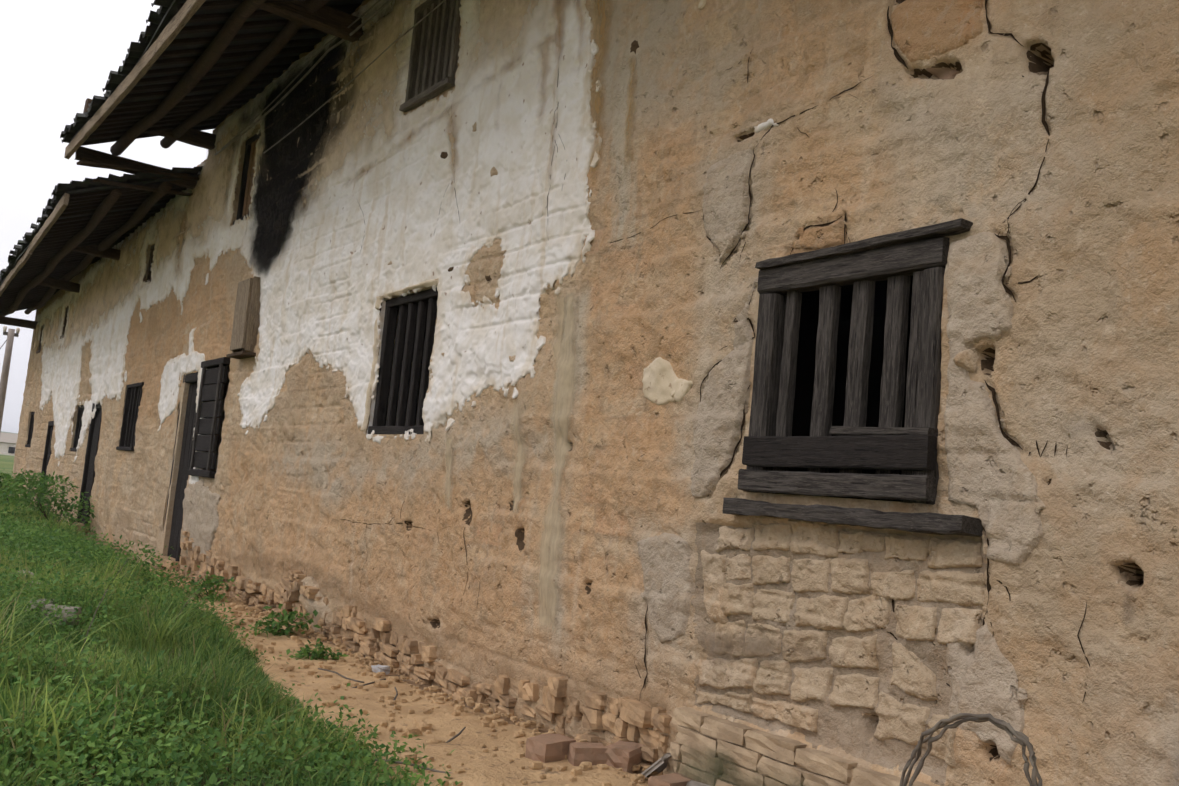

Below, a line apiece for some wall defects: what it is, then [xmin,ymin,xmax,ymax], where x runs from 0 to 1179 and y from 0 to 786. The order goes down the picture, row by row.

crack [887,7,908,69]
spalling [891,0,984,80]
hole [1026,43,1054,75]
leakage [34,116,251,349]
peeling [34,0,602,467]
leakage [253,0,404,271]
crack [611,76,872,268]
crack [995,71,1050,302]
crack [708,385,750,496]
crack [985,381,1023,450]
spalling [462,500,472,526]
spalling [1118,563,1144,586]